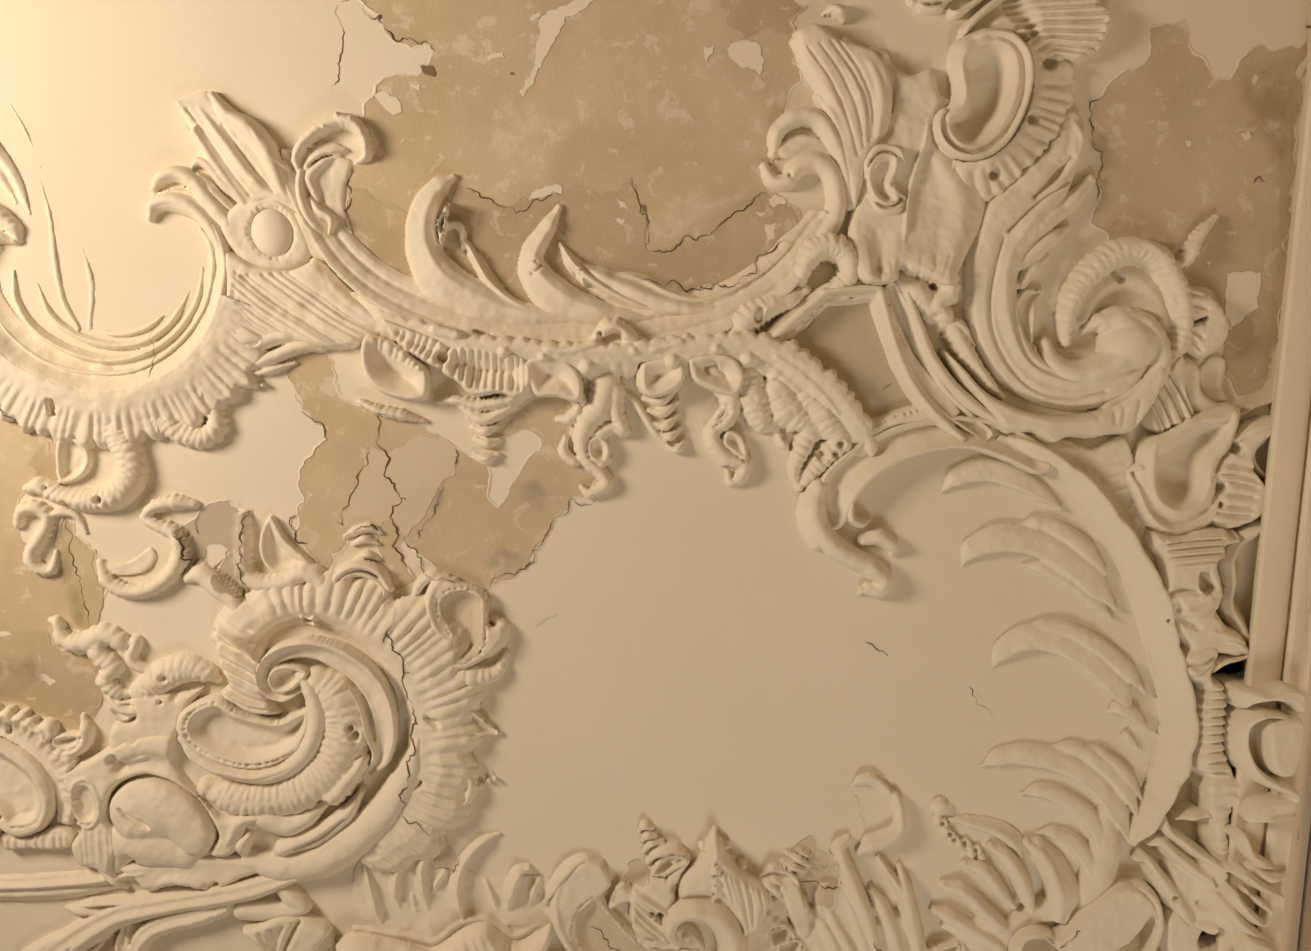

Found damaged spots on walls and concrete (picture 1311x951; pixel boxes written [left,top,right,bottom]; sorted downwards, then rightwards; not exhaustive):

peeling [345,0,808,304]
peeling [1088,19,1311,399]
peeling [0,409,108,731]
peeling [285,352,597,665]
peeling [98,930,119,951]